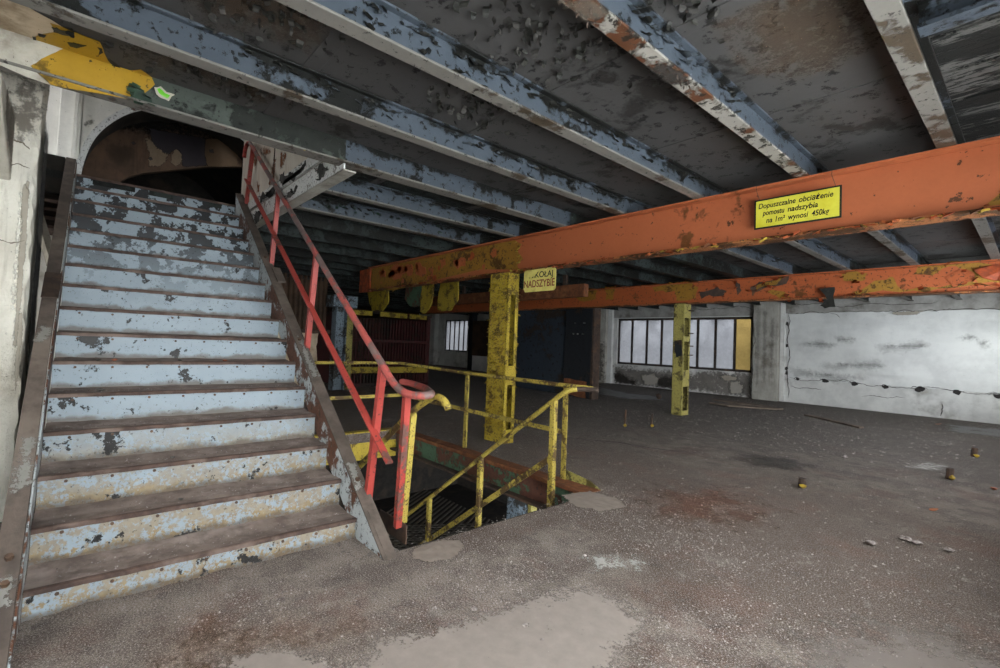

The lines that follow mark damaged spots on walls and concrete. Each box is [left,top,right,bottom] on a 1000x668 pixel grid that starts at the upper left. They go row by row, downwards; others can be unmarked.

peeling [346,1,388,31]
peeling [32,27,120,68]
peeling [400,0,700,182]
rust [647,63,690,90]
peeling [627,0,743,113]
peeling [120,82,238,167]
peeling [251,150,329,224]
peeling [970,191,1000,214]
peeling [297,335,321,378]